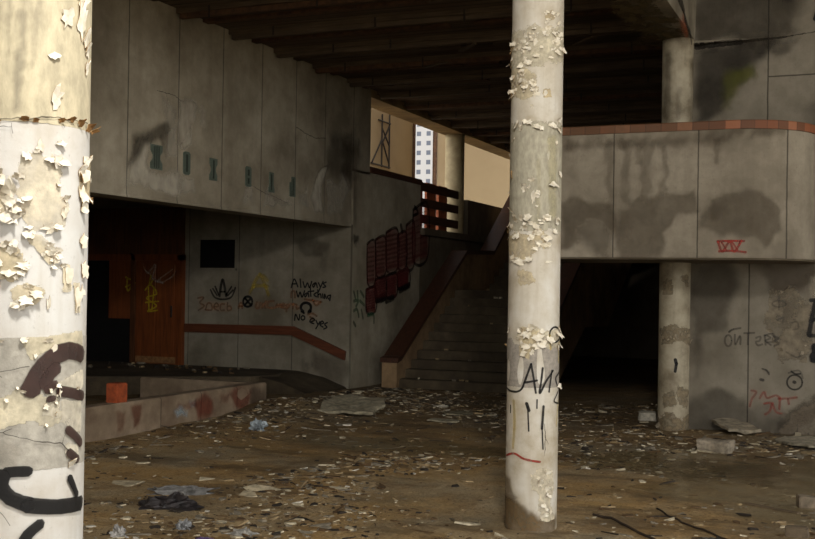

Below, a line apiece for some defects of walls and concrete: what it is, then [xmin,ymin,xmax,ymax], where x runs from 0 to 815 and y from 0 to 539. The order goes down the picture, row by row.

peeling [0,0,100,135]
peeling [506,10,567,108]
leakage [696,0,790,120]
peeling [0,138,94,313]
peeling [507,117,562,286]
crack [0,429,69,451]
peeling [0,331,87,471]
peeling [505,324,565,389]
peeling [530,468,554,522]
spalling [778,397,815,435]